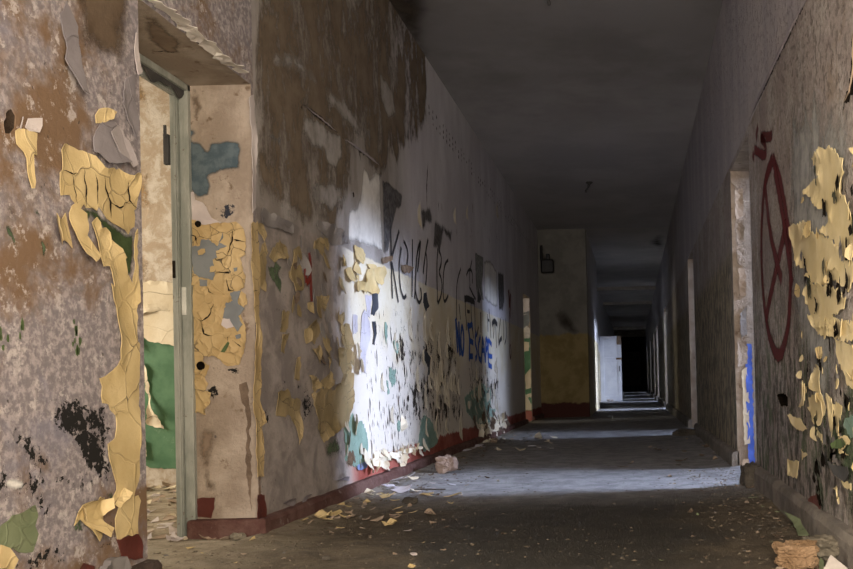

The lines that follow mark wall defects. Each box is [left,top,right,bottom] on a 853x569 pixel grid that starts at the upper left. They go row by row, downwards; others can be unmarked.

flaking render [148,0,249,73]
crack [843,33,853,113]
peeling [2,107,43,188]
flaking render [730,169,746,297]
peeling [56,32,174,569]
peeling [191,94,510,519]
peeling [736,307,750,445]
peeling [777,145,853,511]
leakage [8,429,50,515]
leakage [51,398,111,491]